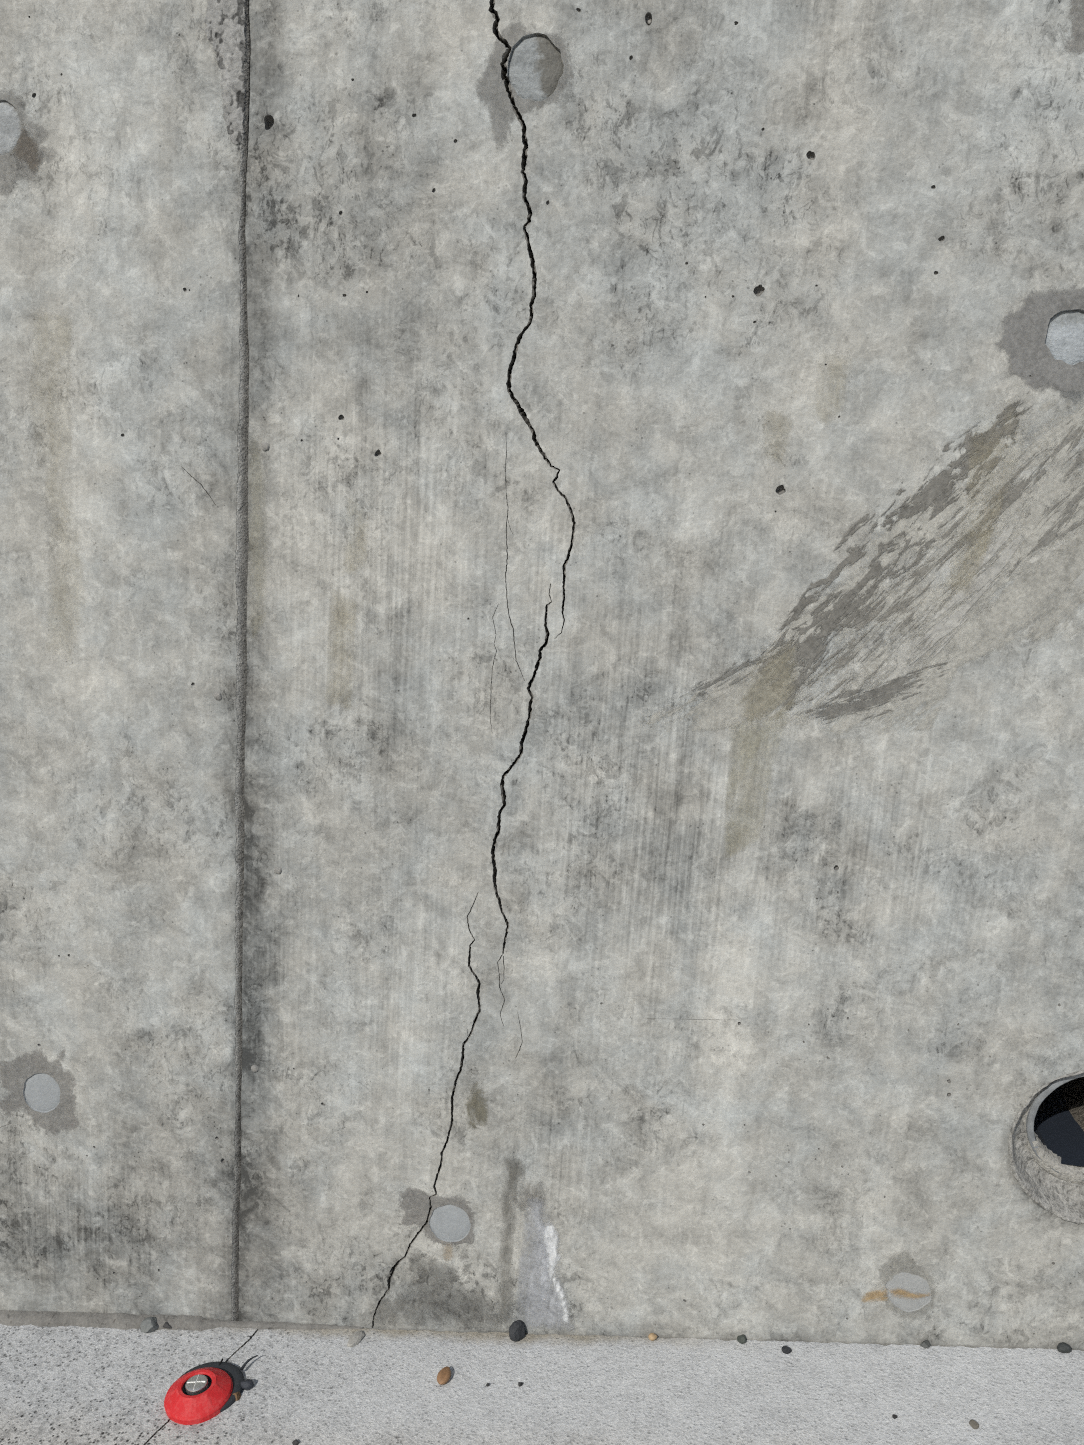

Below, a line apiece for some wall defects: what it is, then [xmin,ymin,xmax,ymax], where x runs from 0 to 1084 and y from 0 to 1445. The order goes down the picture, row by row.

crack [372,0,576,1327]
leakage [506,1201,569,1327]